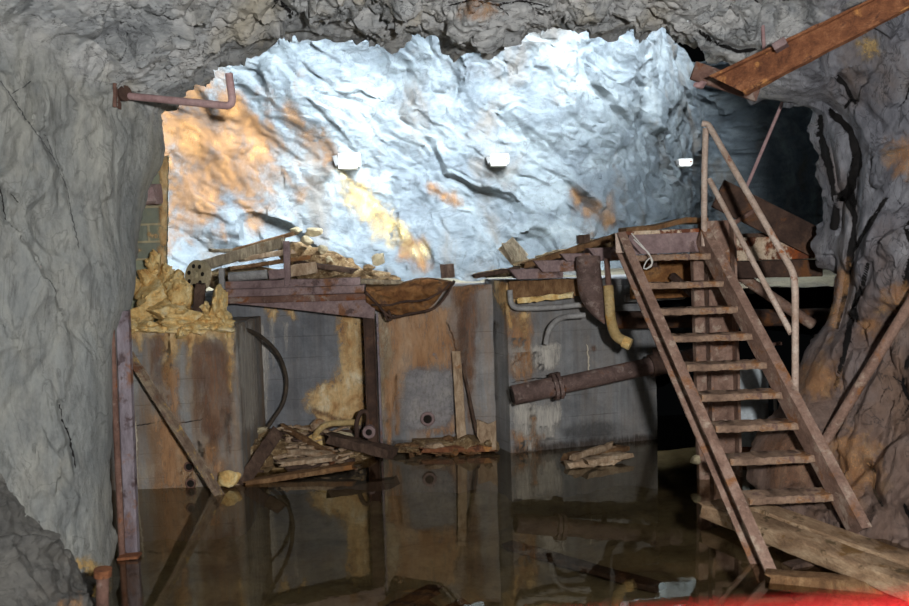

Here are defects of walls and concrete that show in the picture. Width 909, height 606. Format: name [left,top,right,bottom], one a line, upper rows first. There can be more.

rust [130,82,288,488]
rust [379,281,533,443]